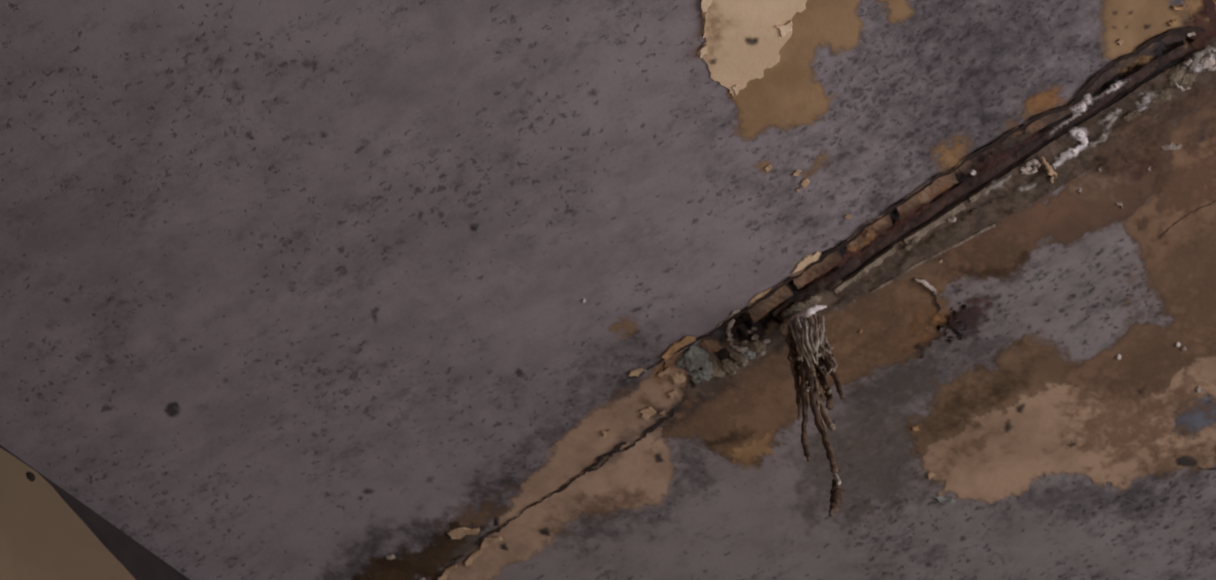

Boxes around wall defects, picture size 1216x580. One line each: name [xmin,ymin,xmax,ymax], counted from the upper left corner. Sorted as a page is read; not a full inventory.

peeling [697,0,864,141]
peeling [878,0,914,23]
rust [1026,87,1068,116]
peeling [1101,0,1216,60]
rust [934,136,971,172]
water stain [645,41,1216,505]
rust [914,278,993,339]
peeling [922,342,1216,505]
water stain [348,494,508,580]
crack [433,410,675,580]